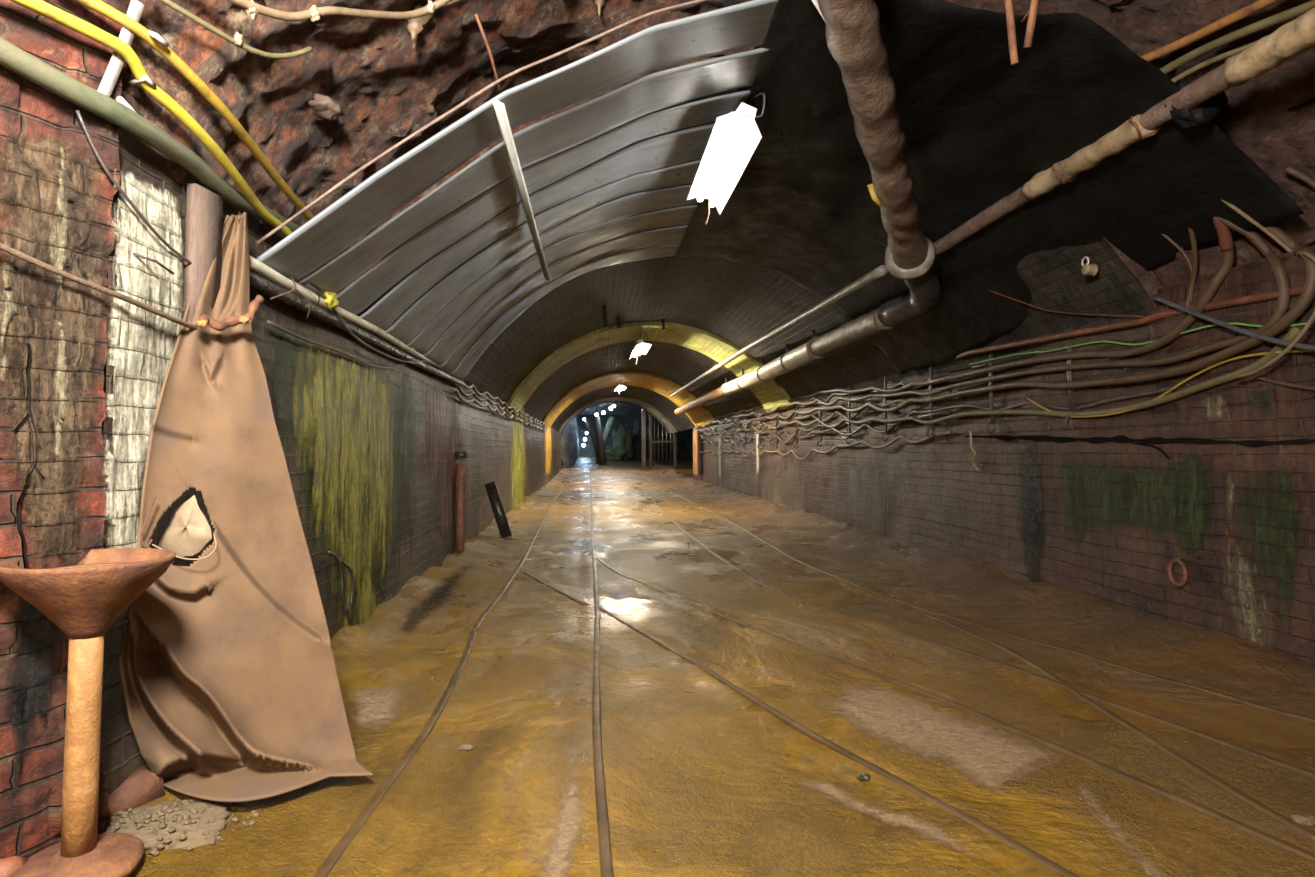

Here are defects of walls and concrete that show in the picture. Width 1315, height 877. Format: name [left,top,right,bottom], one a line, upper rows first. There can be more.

water stain [271,329,414,624]
crack [965,435,1315,460]
water stain [1229,556,1265,646]